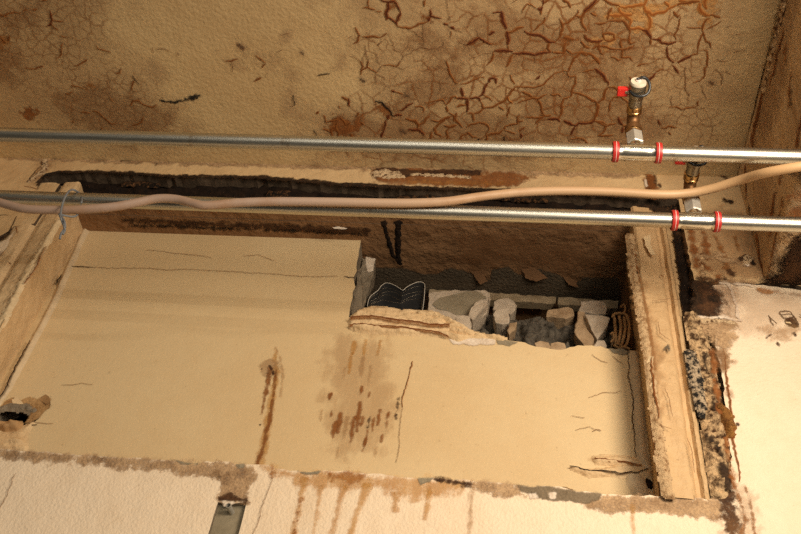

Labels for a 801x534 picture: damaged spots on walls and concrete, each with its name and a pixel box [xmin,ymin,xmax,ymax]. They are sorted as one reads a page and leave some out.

crack [0,0,157,130]
peeling [0,219,62,332]
spalling [371,267,621,304]
peeling [0,394,257,507]
corrosion [257,356,279,464]
corrosion [330,412,342,435]
corrosion [270,465,472,534]
corrosion [350,386,399,446]
crack [396,361,413,461]
peeling [449,338,517,346]
flaking render [471,234,741,521]
damp [719,491,742,534]